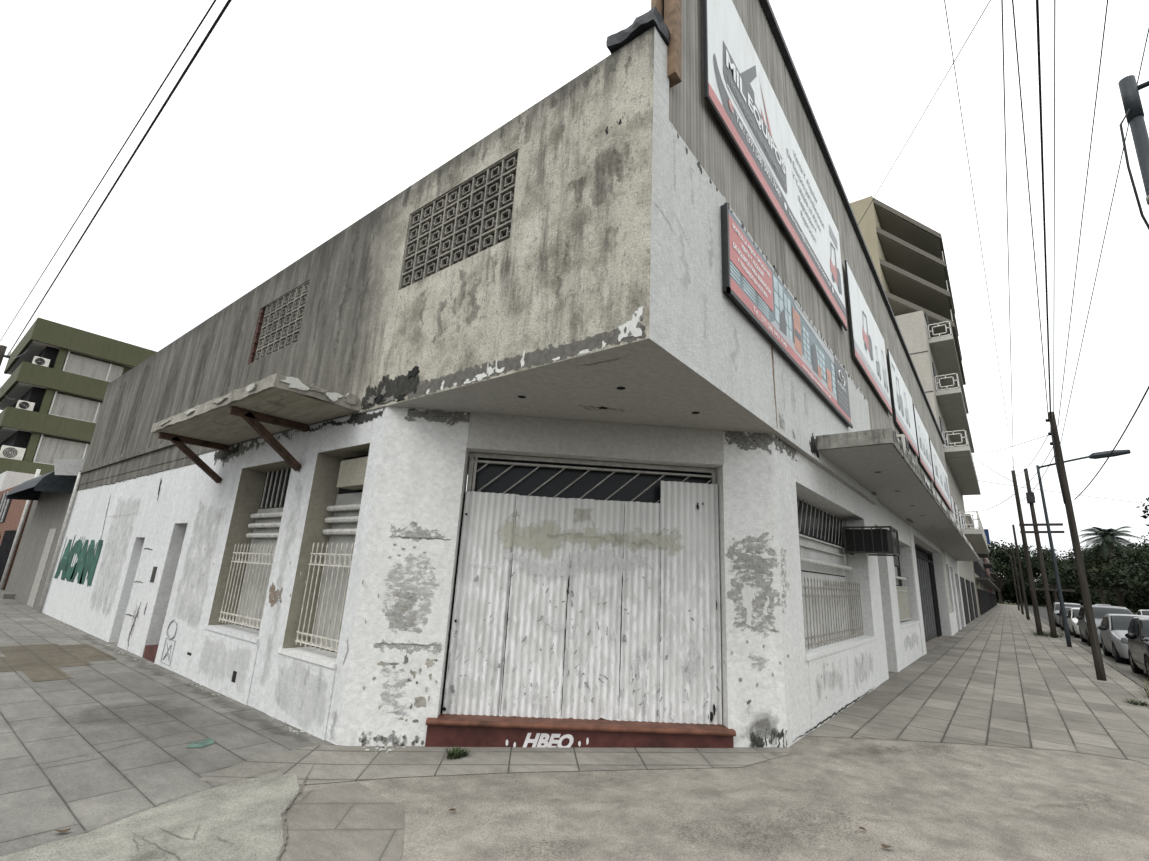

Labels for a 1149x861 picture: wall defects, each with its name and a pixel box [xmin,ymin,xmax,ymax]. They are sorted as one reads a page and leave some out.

water stain [404,324,646,426]
peeling [618,306,645,342]
peeling [362,521,451,723]
peeling [726,533,790,648]
peeling [358,734,424,746]
crack [6,762,315,861]